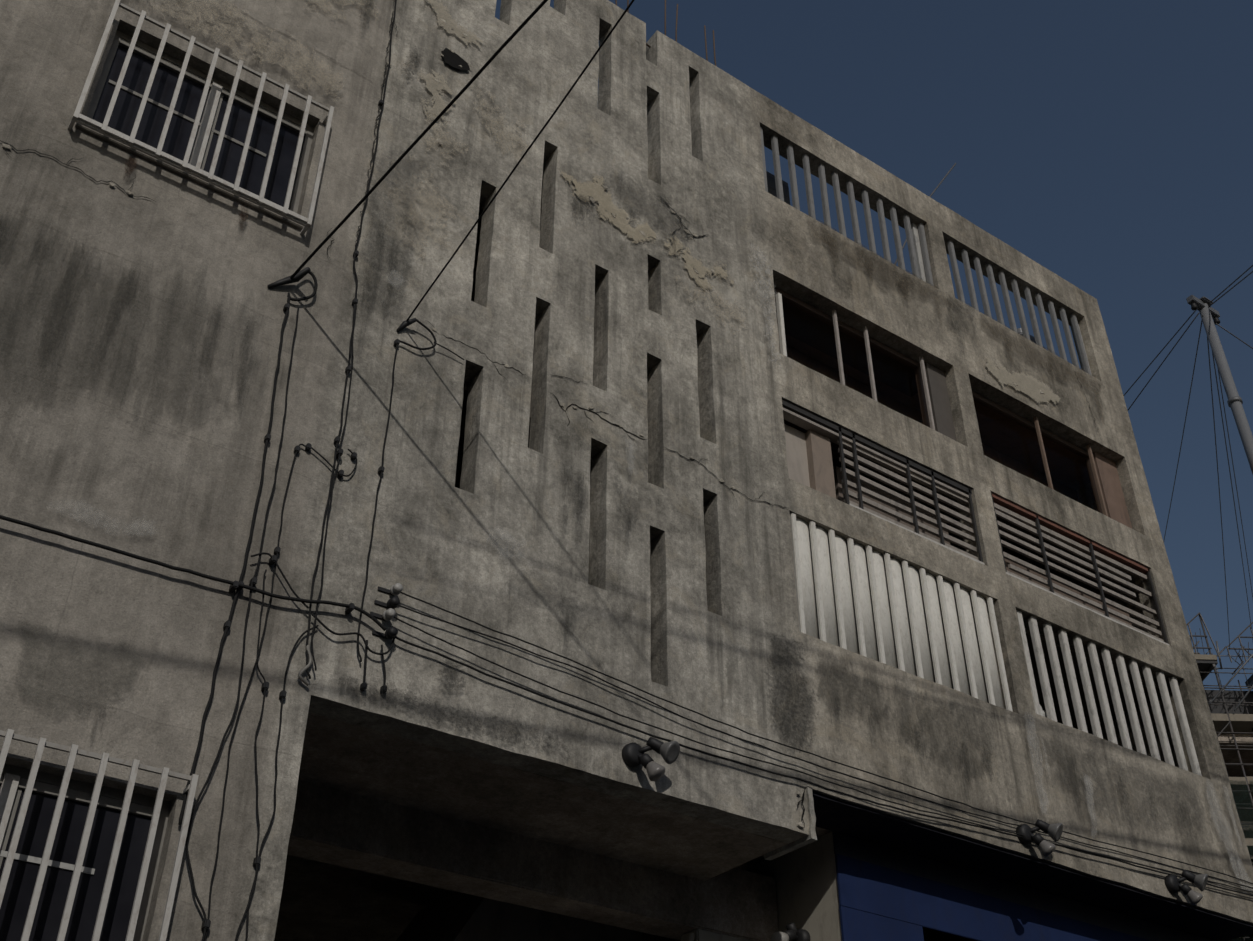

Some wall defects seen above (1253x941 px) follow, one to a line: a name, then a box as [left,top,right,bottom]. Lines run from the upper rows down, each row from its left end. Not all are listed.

spalling [418,0,486,151]
crack [0,140,156,202]
spalling [561,172,734,290]
crack [425,320,787,508]
spalling [986,357,1062,404]